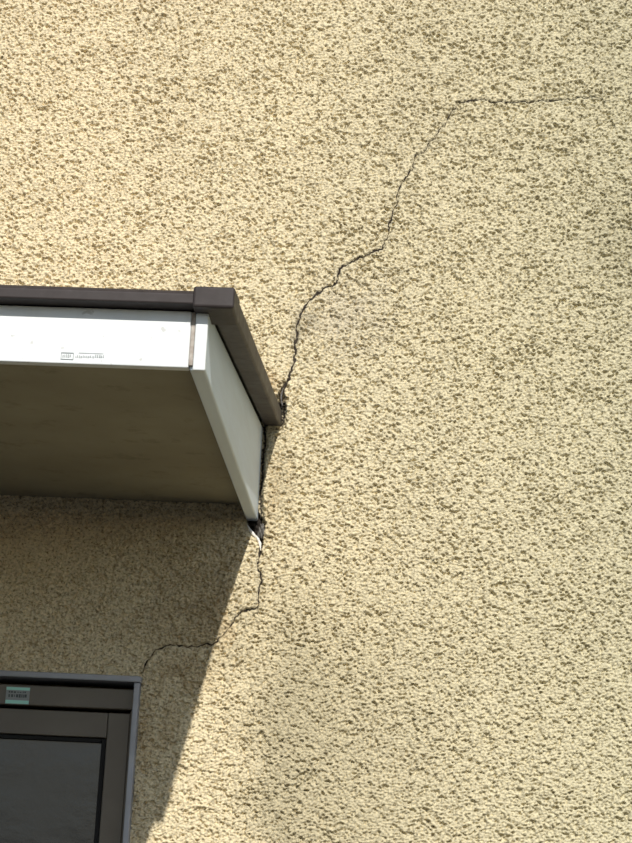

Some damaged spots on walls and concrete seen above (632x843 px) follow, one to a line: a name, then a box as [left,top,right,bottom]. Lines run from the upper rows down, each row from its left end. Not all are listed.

crack [283,96,607,388]
crack [141,547,263,673]